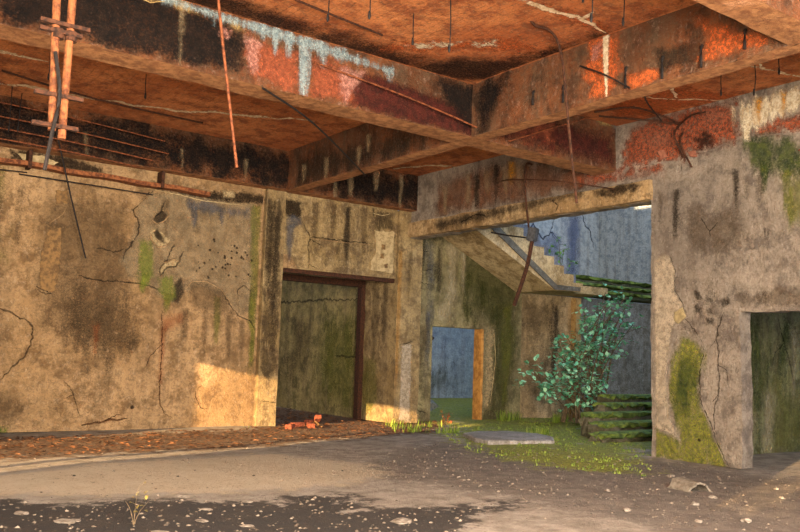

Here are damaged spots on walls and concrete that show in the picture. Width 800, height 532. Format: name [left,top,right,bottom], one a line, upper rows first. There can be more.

crack [525,0,606,33]
damp [162,0,472,136]
damp [70,94,308,121]
damp [298,133,424,183]
spalling [757,115,800,136]
spalling [150,203,184,276]
spalling [122,190,263,262]
spalling [173,238,255,329]
crack [0,308,35,379]